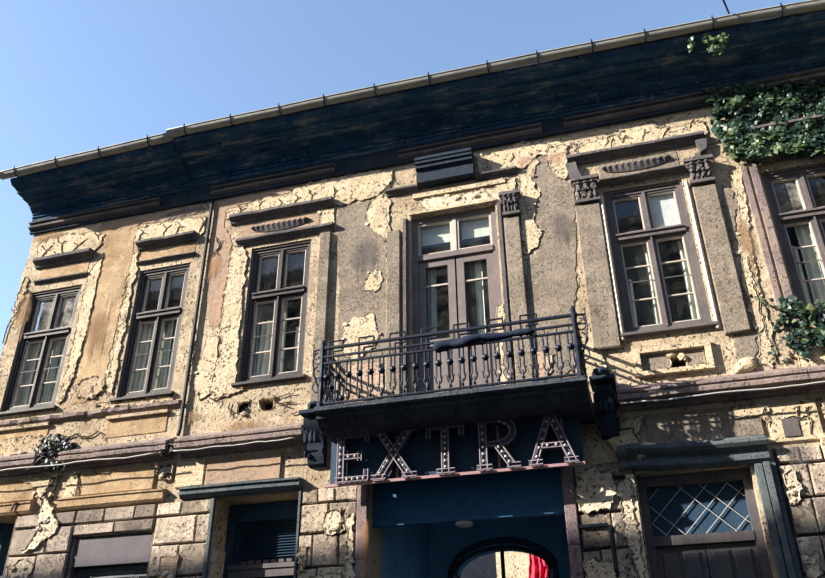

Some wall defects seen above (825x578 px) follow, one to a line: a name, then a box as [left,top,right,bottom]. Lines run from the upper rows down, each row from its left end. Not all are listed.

peeling [415,119,708,255]
spalling [13,276,29,318]
crack [41,232,101,257]
peeling [36,215,206,408]
peeling [192,246,251,416]
peeling [362,269,384,293]
spalling [0,434,61,457]
spalling [5,474,59,578]
spalling [156,554,180,578]
spalling [575,466,647,578]